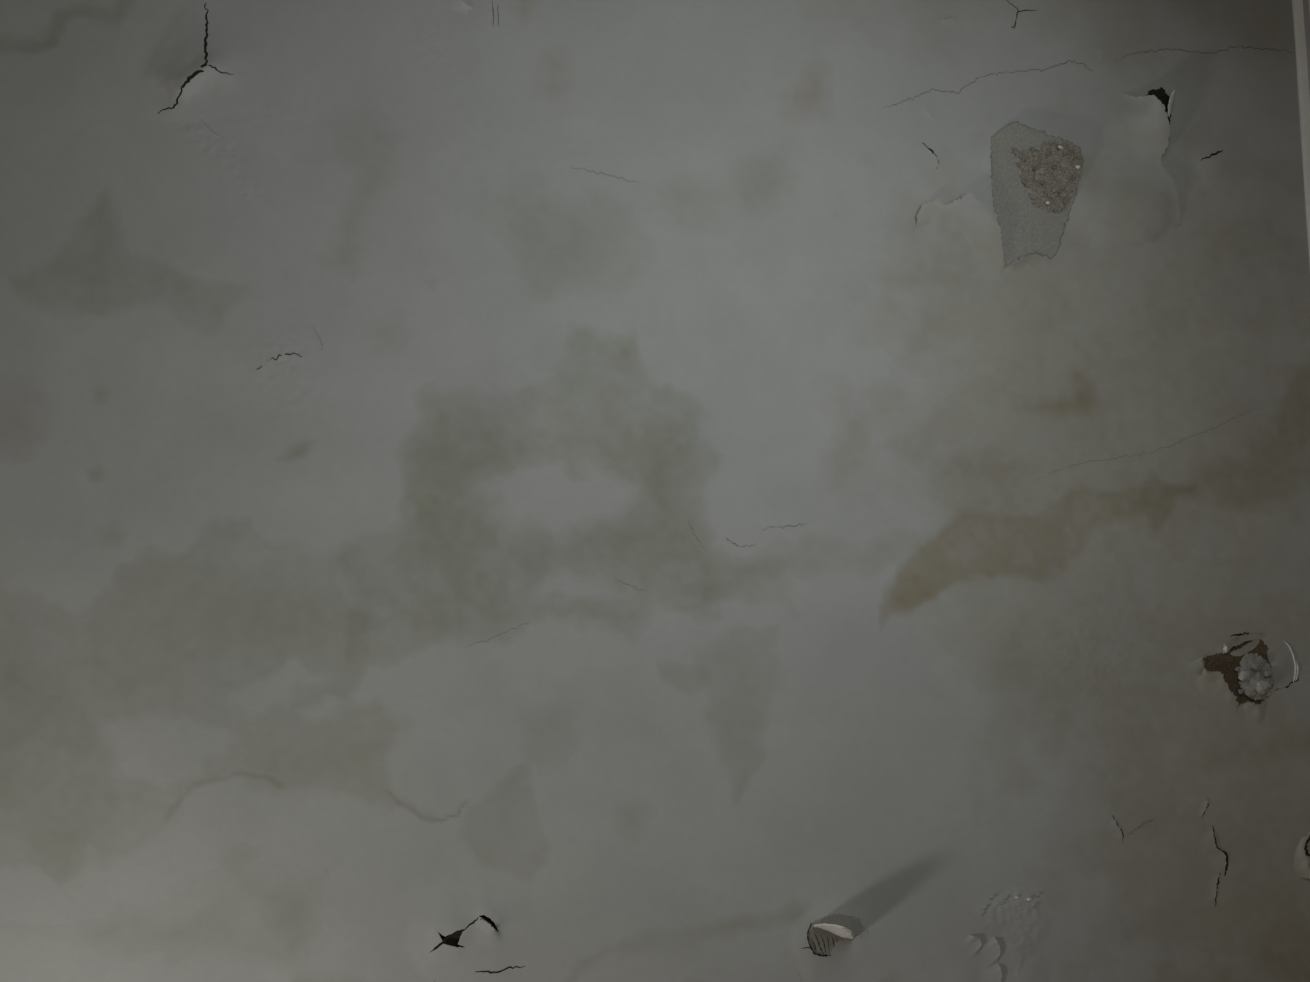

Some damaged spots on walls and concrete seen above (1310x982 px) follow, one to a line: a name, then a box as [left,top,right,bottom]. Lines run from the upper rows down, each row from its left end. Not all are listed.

peeling [913,87,1180,276]
leakage [0,320,741,891]
leakage [655,622,788,806]
leakage [737,100,1310,982]
flaking render [1185,632,1299,725]
leakage [0,842,368,982]
crack [1197,799,1228,907]
peeling [1293,832,1310,879]